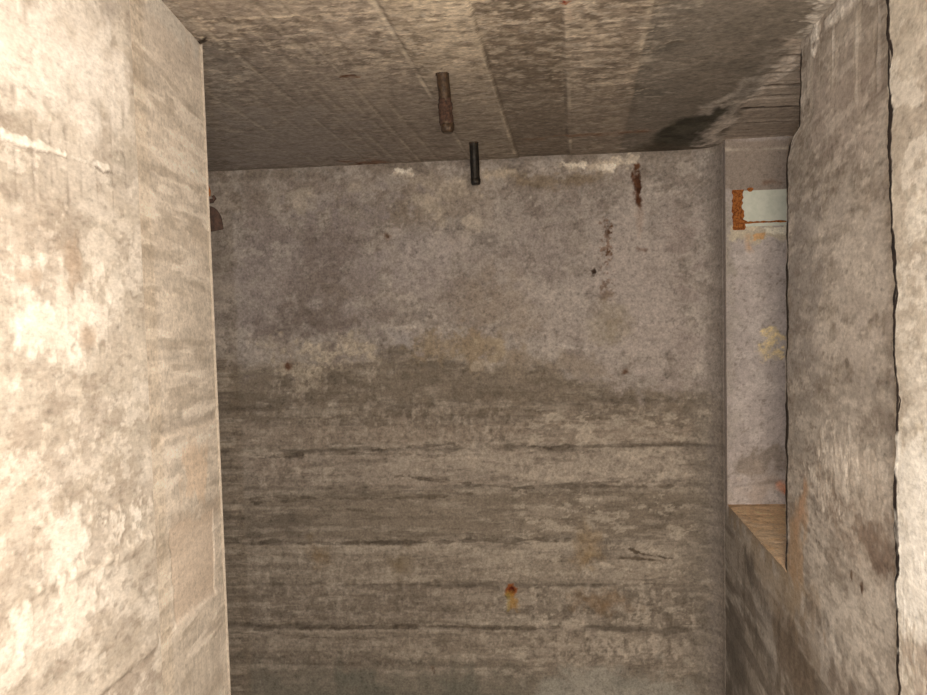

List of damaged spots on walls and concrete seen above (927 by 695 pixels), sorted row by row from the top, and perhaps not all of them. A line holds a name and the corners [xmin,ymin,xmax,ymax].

rust [438,97,454,126]
damp [601,0,882,153]
rust [590,212,623,299]
rust [629,162,649,253]
crack [785,49,803,573]
crack [886,0,902,433]
rust [503,582,521,614]
crack [893,475,902,695]